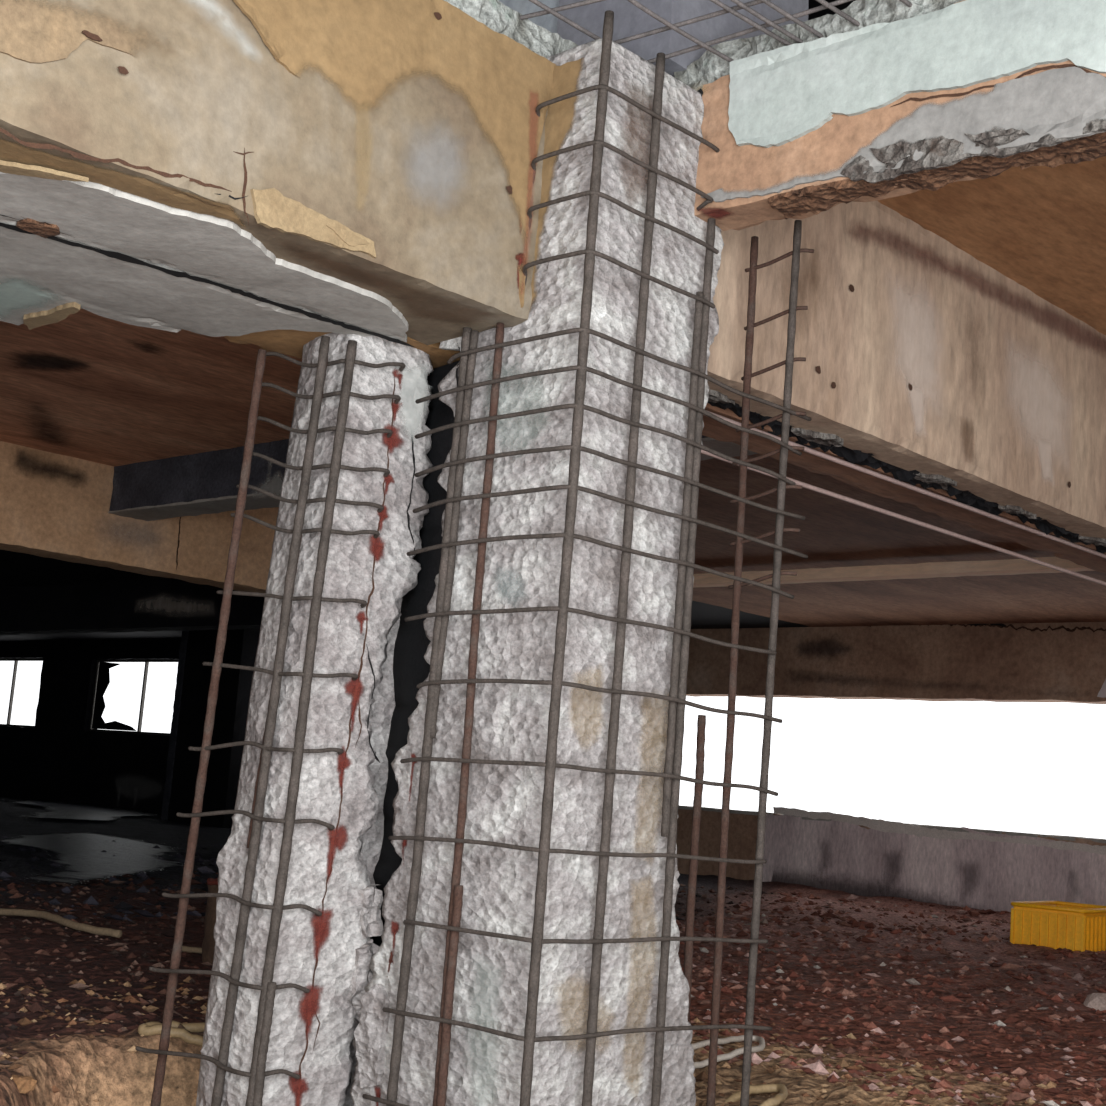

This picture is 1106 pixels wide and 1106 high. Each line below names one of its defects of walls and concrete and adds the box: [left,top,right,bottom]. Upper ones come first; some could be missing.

crack [0,215,414,347]
corrosion [370,474,394,561]
peeling [233,0,1106,1106]
peeling [0,139,409,1106]
crack [336,343,460,954]
corrosion [337,747,351,793]
corrosion [327,826,348,877]
crack [322,868,332,912]
corrosion [311,910,332,960]
crack [311,958,319,987]
corrosion [300,986,322,1035]
crack [299,1014,320,1078]